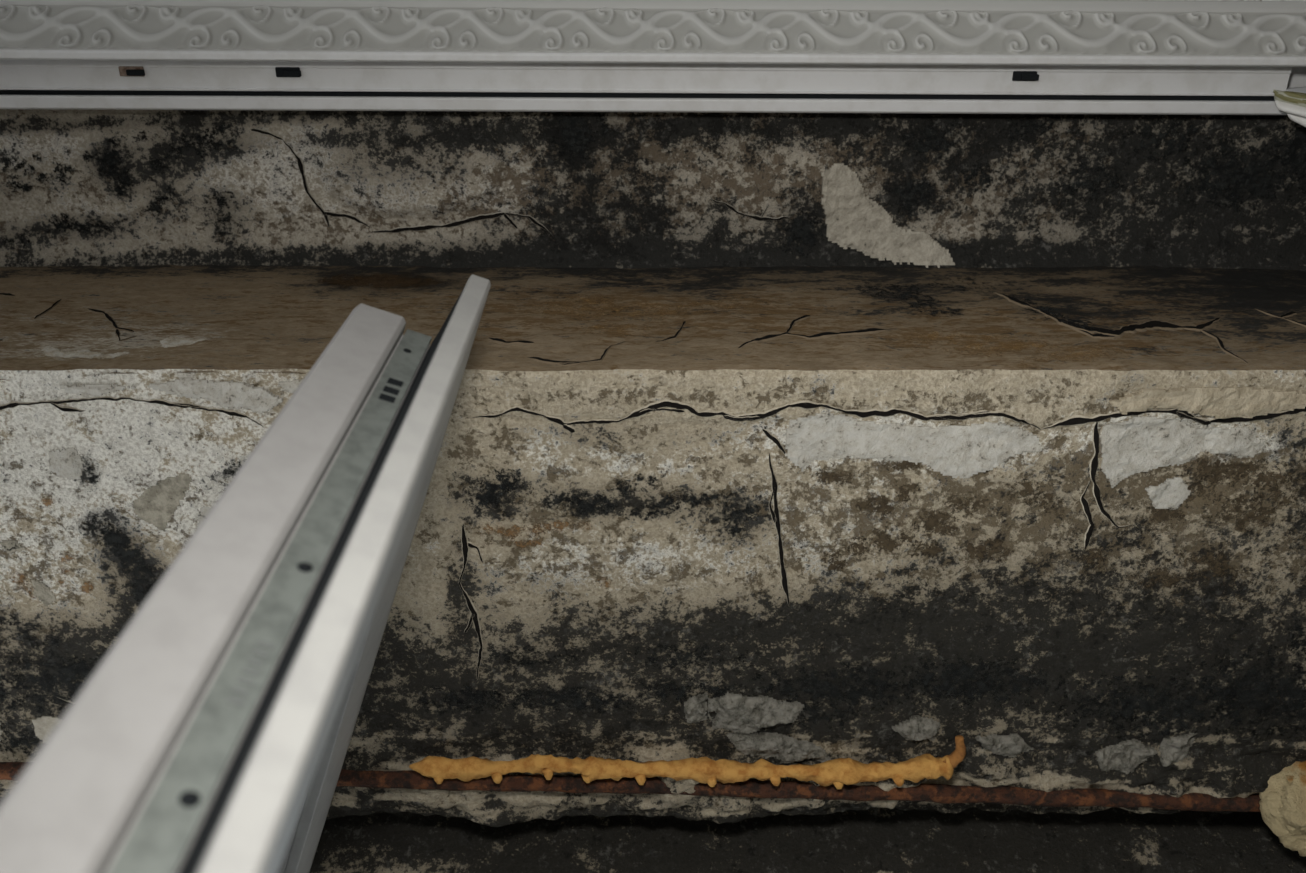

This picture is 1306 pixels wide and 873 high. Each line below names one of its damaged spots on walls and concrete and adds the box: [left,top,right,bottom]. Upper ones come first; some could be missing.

crack [251,128,552,235]
flaking render [821,163,955,268]
crack [993,292,1248,364]
crack [0,396,263,427]
flaking render [785,411,1041,478]
damp [468,469,759,538]
crack [472,399,1306,607]
damp [815,461,1014,574]
damp [1146,453,1306,533]
damp [407,609,1306,743]
flaking render [684,691,831,763]
flaking render [1095,733,1198,774]